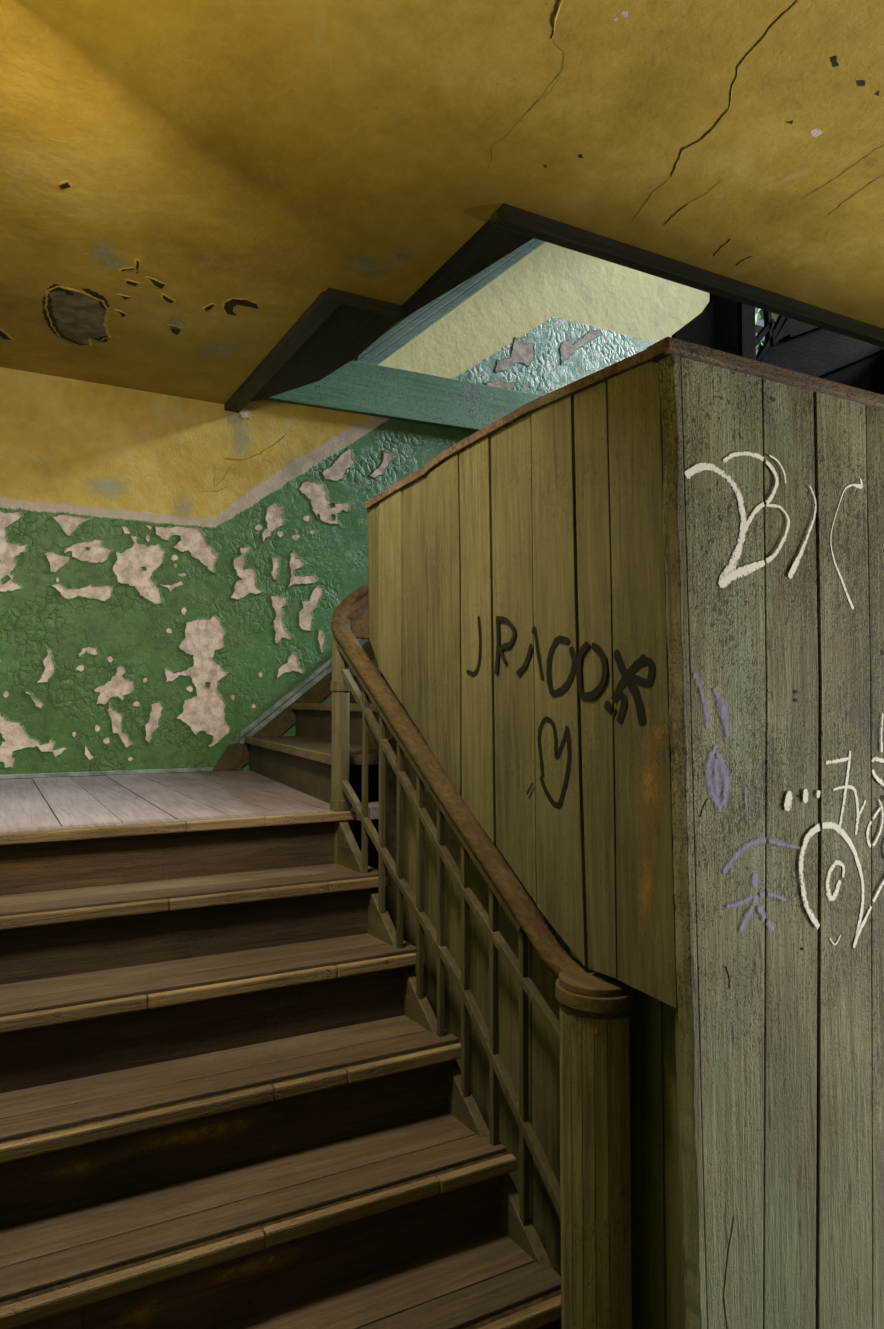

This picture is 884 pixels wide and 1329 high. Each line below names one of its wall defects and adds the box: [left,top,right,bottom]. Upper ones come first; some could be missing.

crack [488,0,564,168]
crack [631,0,798,225]
crack [806,147,880,216]
flaking render [42,259,177,346]
flaking render [202,297,260,316]
peeling [484,336,536,390]
peeling [559,329,604,365]
peeling [368,450,394,479]
peeling [0,509,28,593]
peeling [43,448,357,680]
peeling [0,648,93,769]
peeling [76,607,235,761]